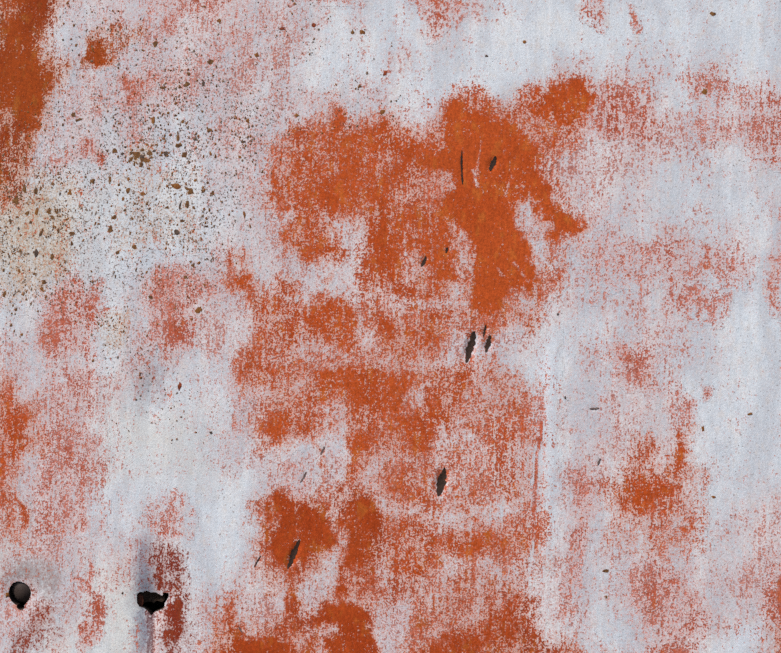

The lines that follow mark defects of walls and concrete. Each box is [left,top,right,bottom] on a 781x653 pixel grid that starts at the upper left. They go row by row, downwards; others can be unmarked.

rust [0,0,244,337]
rust [75,299,150,362]
rust [155,67,669,653]
rust [0,363,52,552]
rust [595,422,716,567]
damp [144,611,158,653]